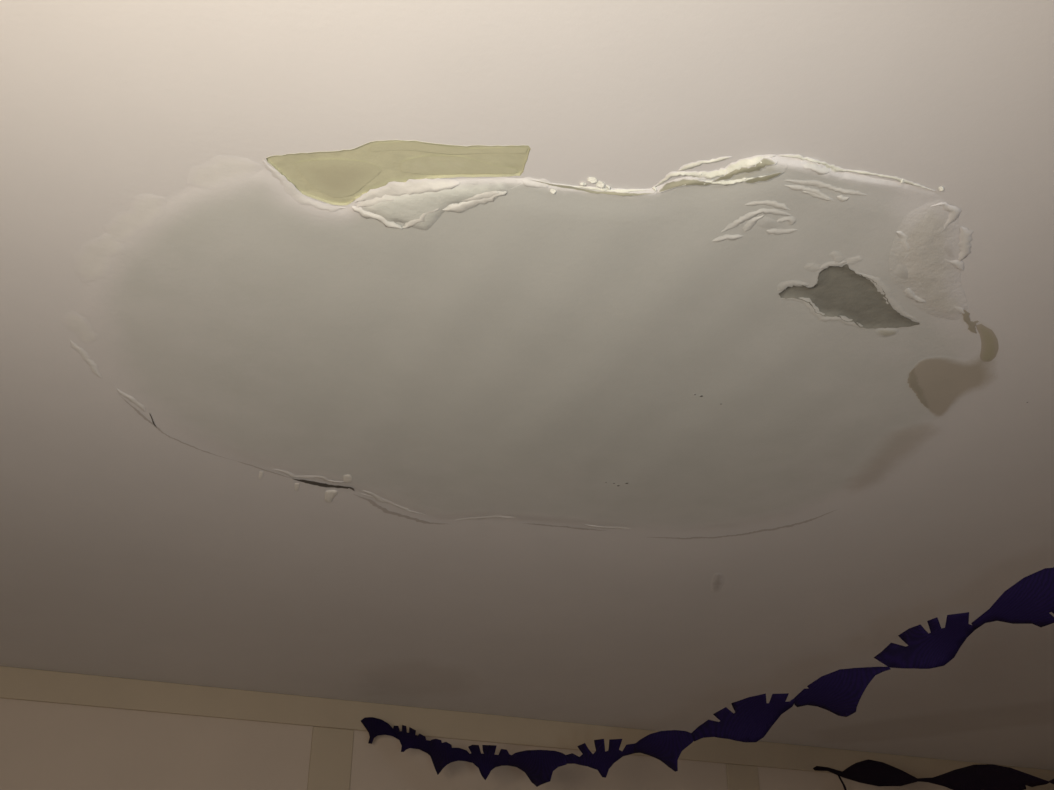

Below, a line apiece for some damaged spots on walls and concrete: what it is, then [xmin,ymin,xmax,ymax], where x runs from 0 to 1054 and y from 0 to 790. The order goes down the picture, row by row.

peeling [263,140,551,230]
flaking render [777,251,919,337]
crack [70,340,841,540]
leakage [835,304,1004,498]